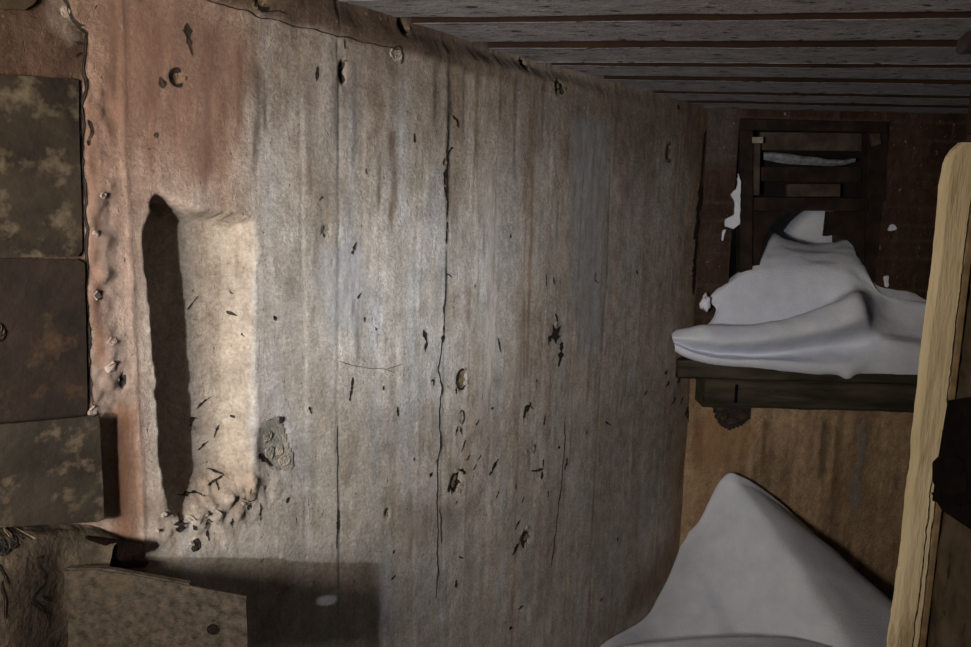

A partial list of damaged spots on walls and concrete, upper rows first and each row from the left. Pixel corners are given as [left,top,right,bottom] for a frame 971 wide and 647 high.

spalling [252,0,269,12]
spalling [158,67,186,89]
crack [443,112,459,243]
crack [692,130,706,295]
spalling [548,314,564,367]
spalling [455,367,469,393]
spalling [178,468,224,497]
spalling [257,416,293,471]
crack [435,268,452,592]
spalling [447,410,481,504]
spalling [156,509,235,552]